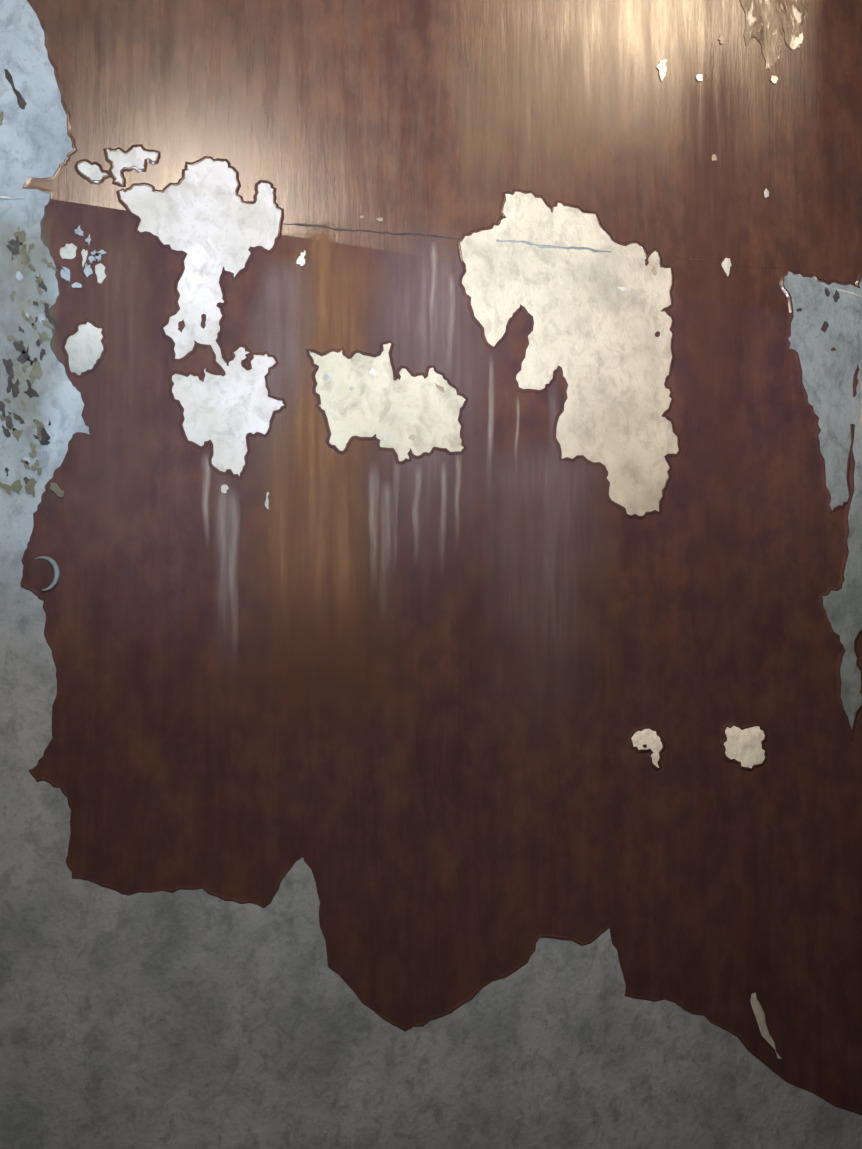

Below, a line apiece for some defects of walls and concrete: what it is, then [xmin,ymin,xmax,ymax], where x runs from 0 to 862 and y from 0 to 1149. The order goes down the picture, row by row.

spalling [4,69,27,109]
peeling [23,0,78,317]
peeling [74,144,287,480]
peeling [456,189,681,519]
peeling [740,0,809,83]
peeling [20,269,862,1115]